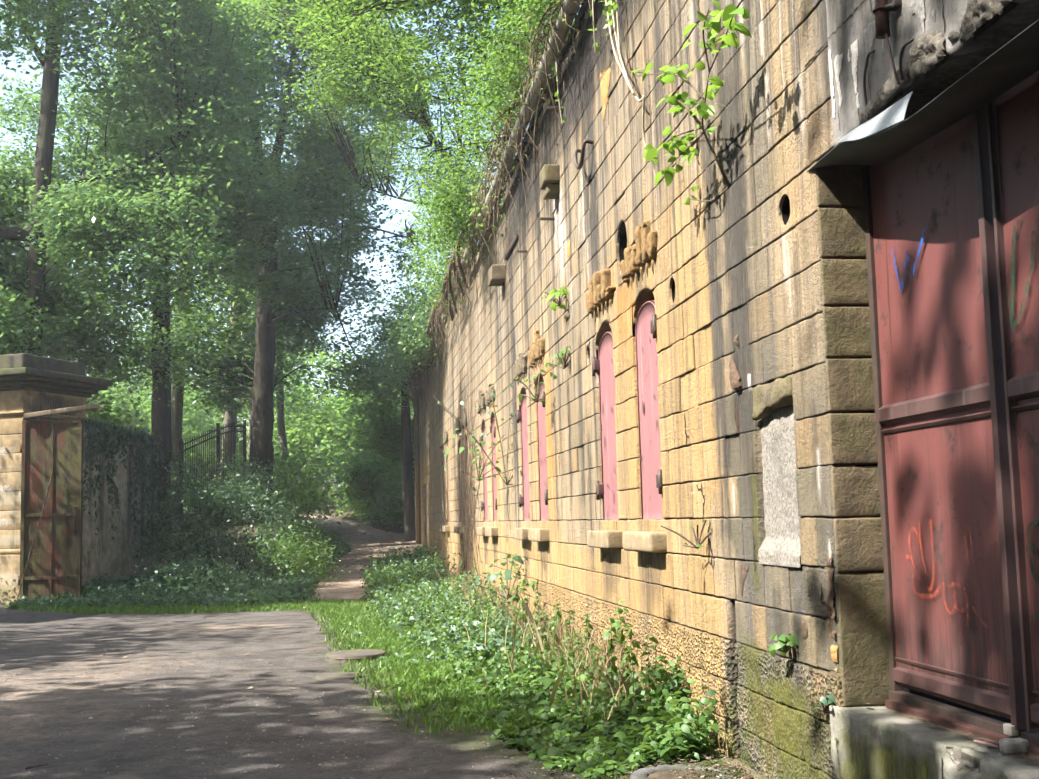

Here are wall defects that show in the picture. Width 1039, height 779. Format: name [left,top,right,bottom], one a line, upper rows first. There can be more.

damp [843,735,903,779]